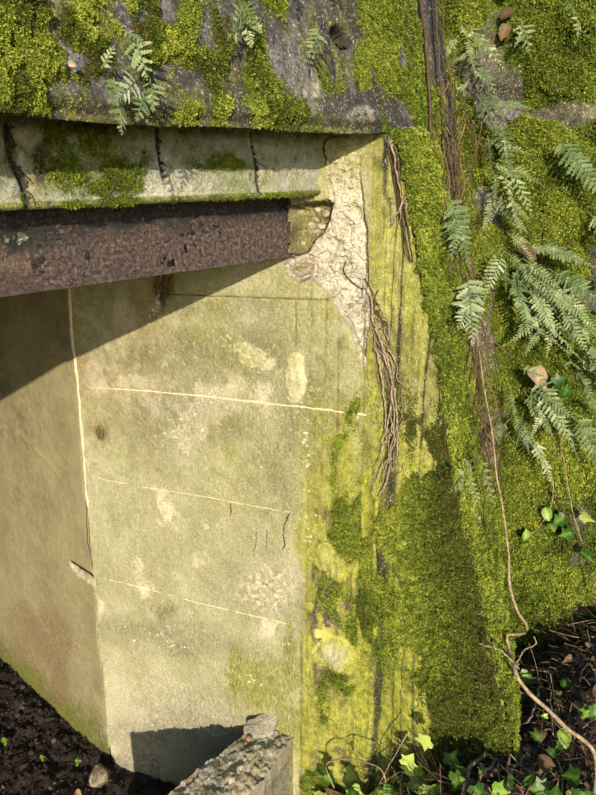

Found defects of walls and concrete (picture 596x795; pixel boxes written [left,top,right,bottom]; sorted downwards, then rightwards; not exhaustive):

crack [5,126,36,207]
crack [155,131,168,177]
crack [249,134,267,195]
spalling [284,139,370,369]
water stain [148,273,173,325]
crack [253,512,291,552]